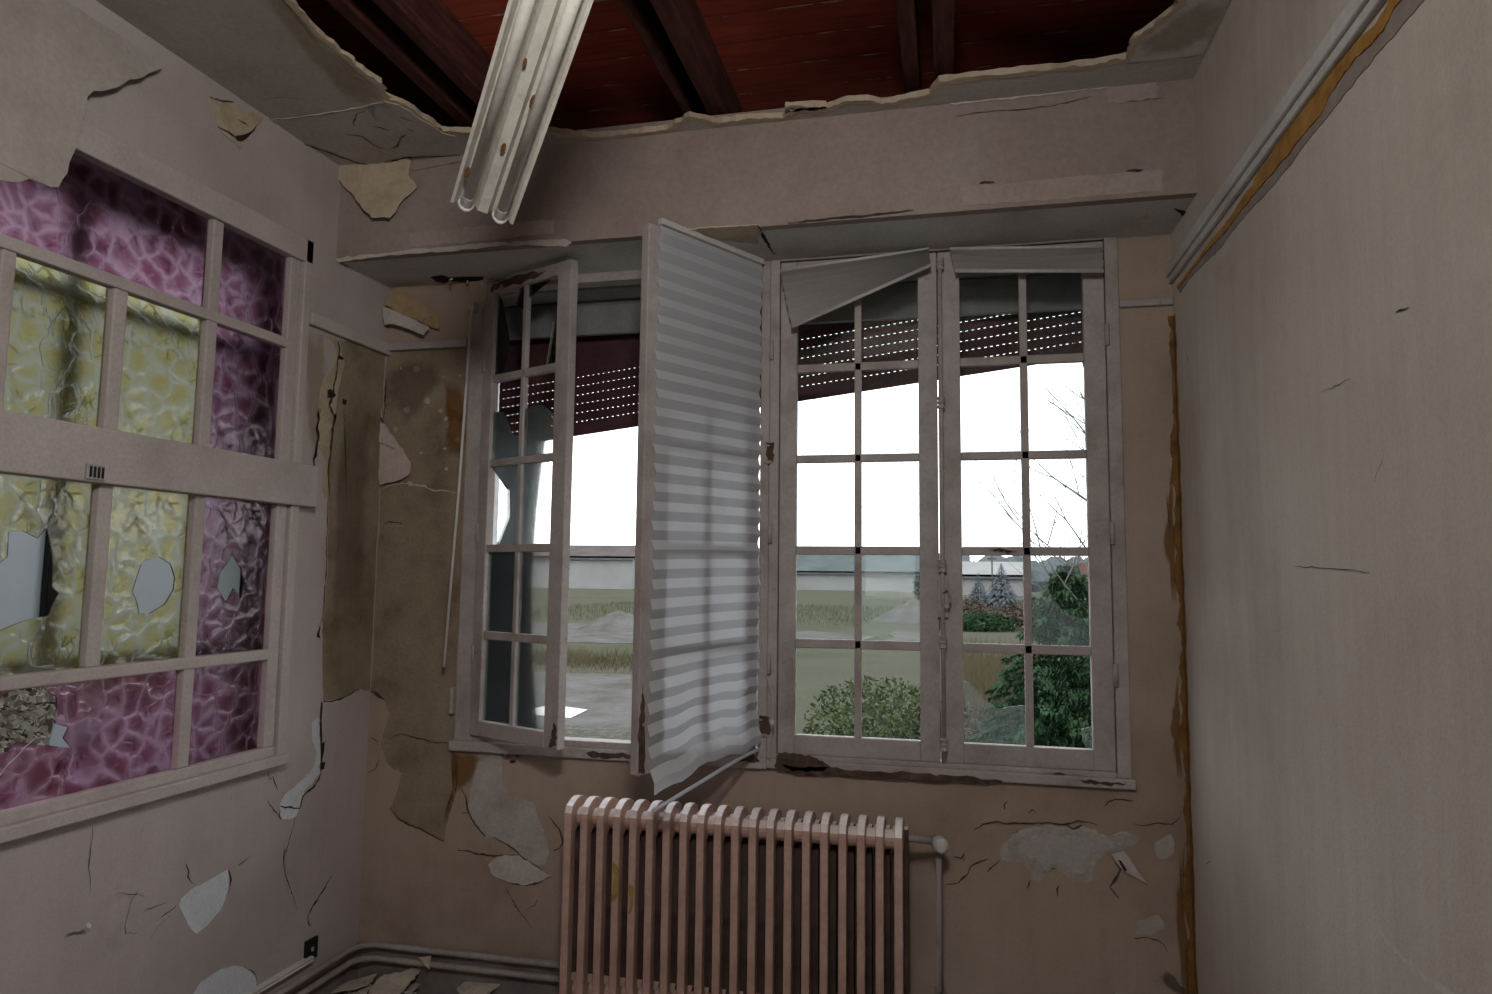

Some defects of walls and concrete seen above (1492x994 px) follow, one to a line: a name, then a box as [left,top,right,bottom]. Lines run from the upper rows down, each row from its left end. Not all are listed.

spalling [546,0,1187,140]
flaking render [267,286,563,886]
crack [86,827,94,895]
flaking render [162,856,250,933]
crack [283,820,332,926]
flaking render [974,820,1175,899]
flaking render [194,966,258,994]